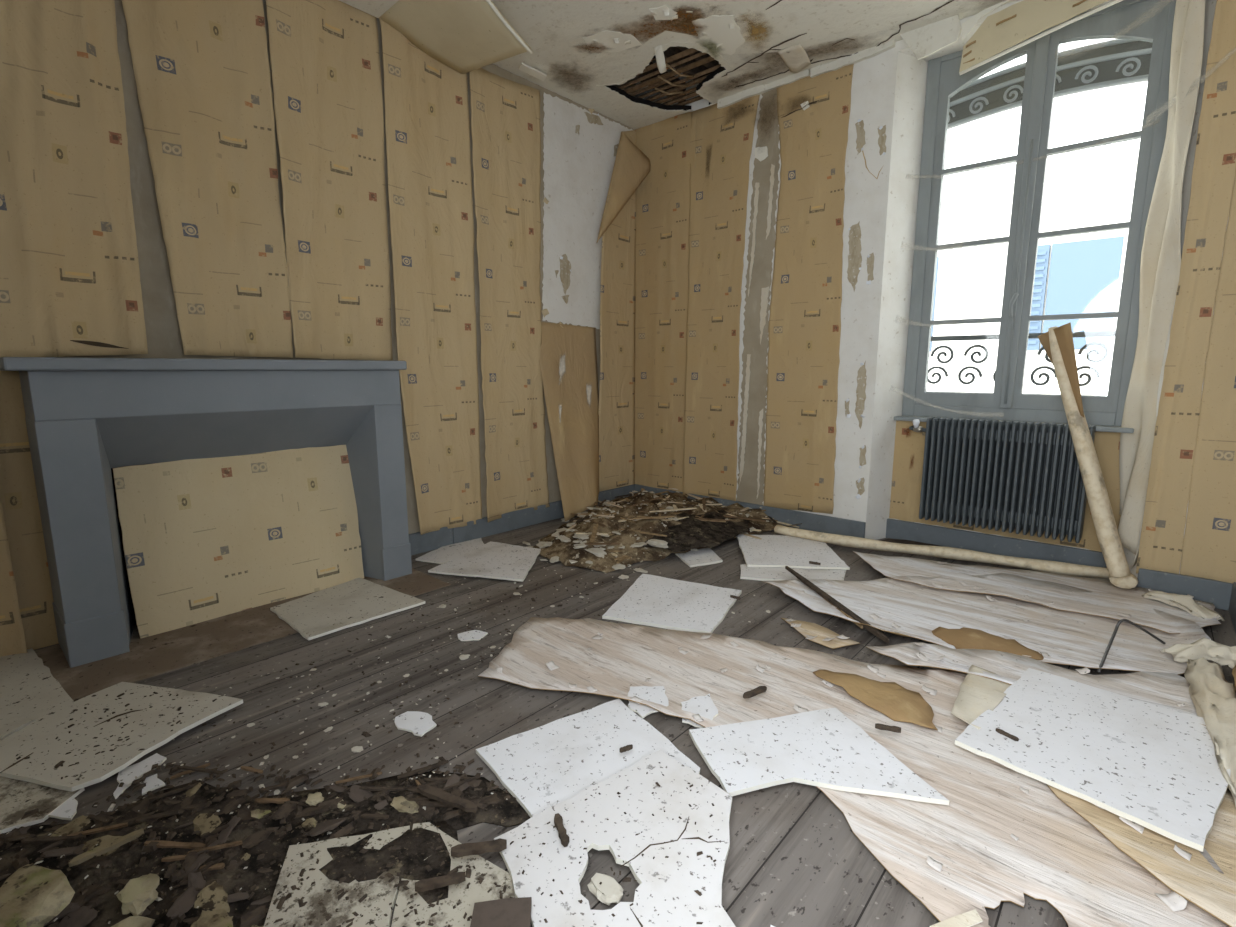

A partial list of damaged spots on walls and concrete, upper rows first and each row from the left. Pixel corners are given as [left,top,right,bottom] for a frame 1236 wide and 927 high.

spalling [582,30,667,73]
leakage [618,9,702,40]
spalling [649,5,745,55]
leakage [744,20,768,40]
leakage [806,40,858,57]
spalling [855,119,887,155]
spalling [847,221,874,291]
peeling [739,146,775,498]
spalling [845,361,867,429]
spalling [856,445,866,499]